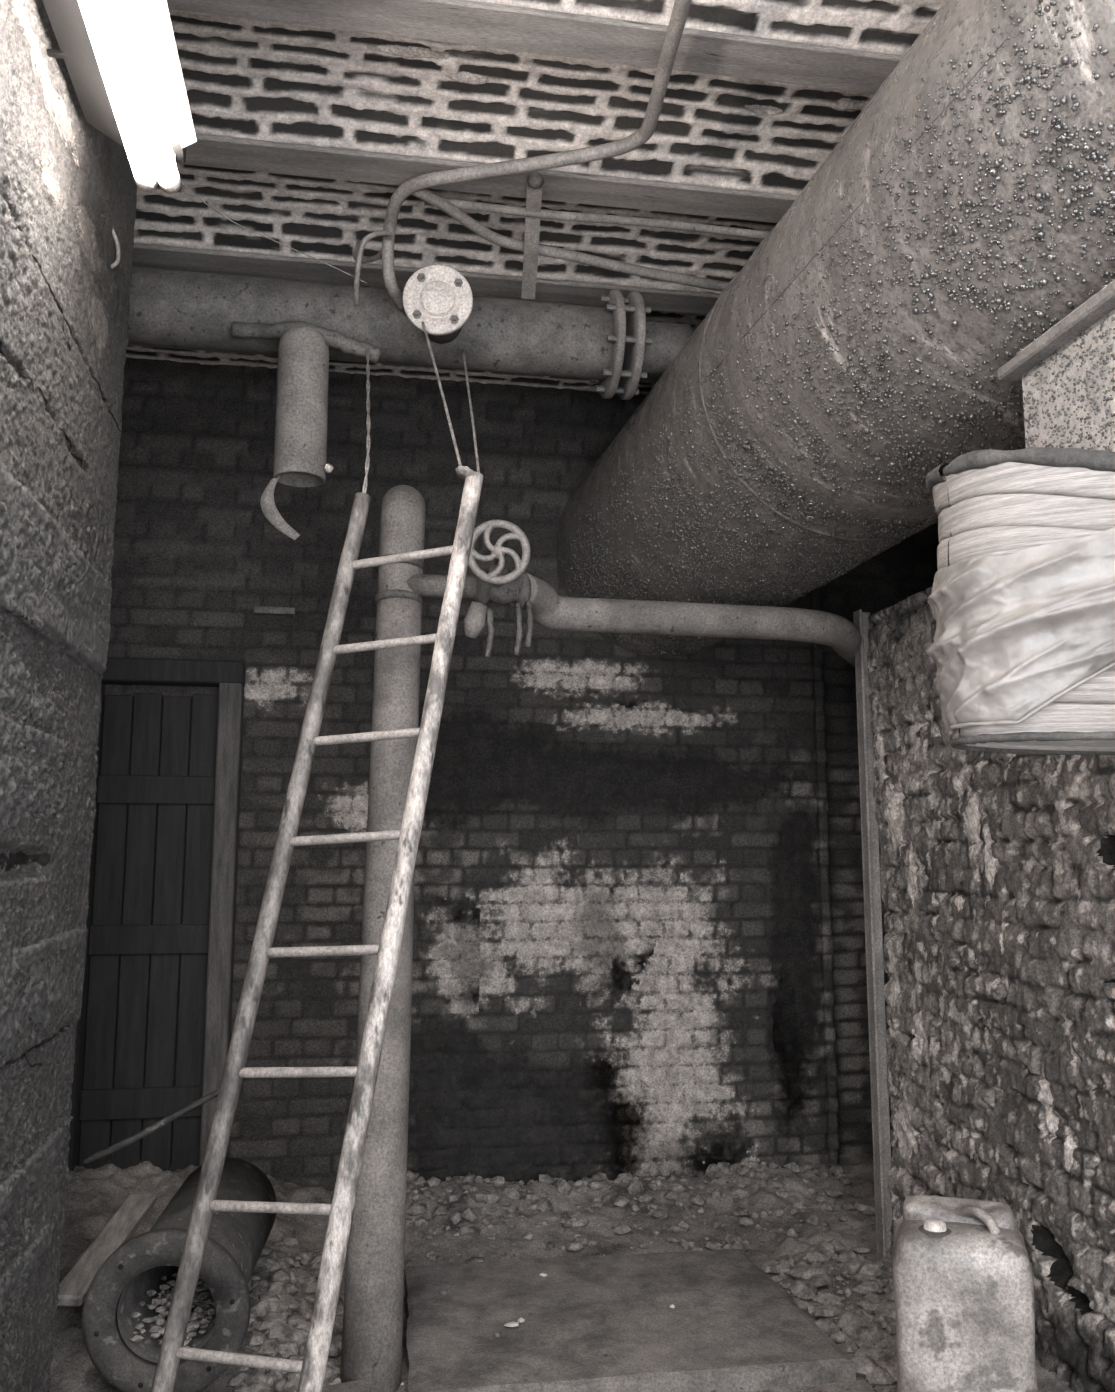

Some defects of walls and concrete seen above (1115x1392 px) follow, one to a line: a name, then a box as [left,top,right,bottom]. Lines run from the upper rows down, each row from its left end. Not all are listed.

crack [0,340,83,468]
crack [11,215,121,432]
spalling [1095,832,1115,870]
damp [766,807,820,1104]
damp [407,1022,620,1185]
spalling [1031,1225,1094,1315]